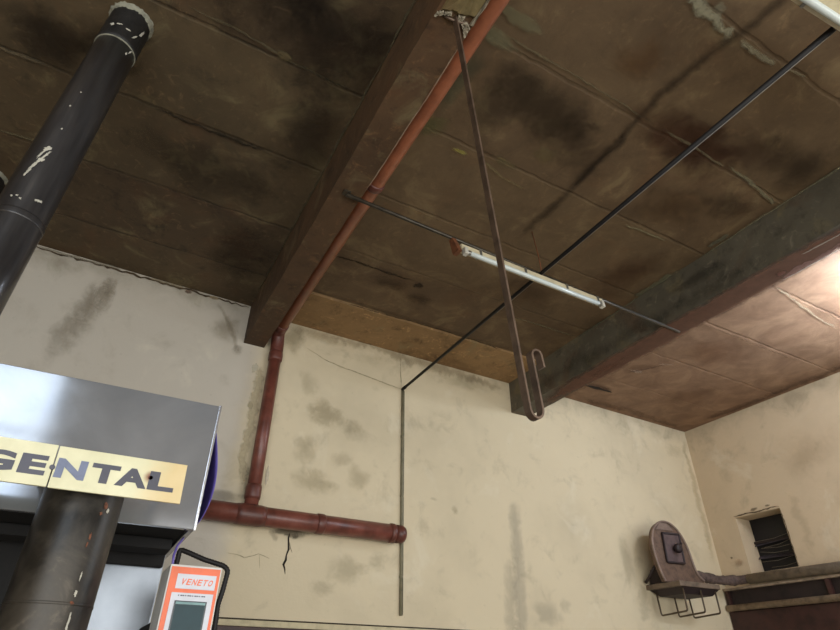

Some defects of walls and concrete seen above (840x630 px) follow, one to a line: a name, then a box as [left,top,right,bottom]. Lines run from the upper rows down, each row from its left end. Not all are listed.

crack [230,534,292,572]